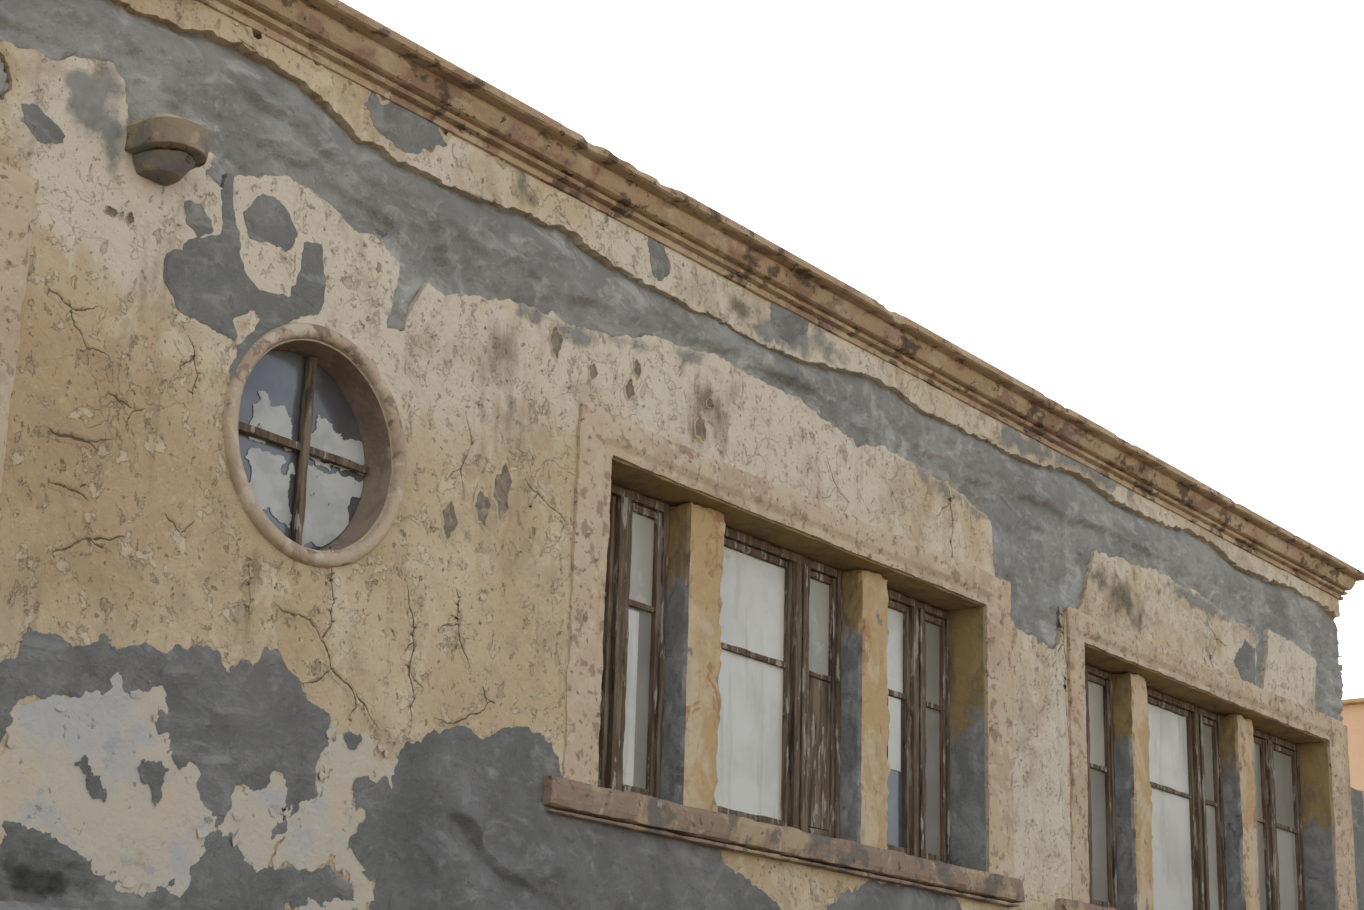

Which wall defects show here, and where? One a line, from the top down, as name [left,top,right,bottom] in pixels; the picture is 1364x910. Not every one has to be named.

crack [48,284,146,557]
crack [161,512,196,538]
crack [180,334,205,402]
crack [446,410,476,500]
flaking render [0,0,1343,721]
crack [239,547,495,735]
peeling [0,672,398,910]